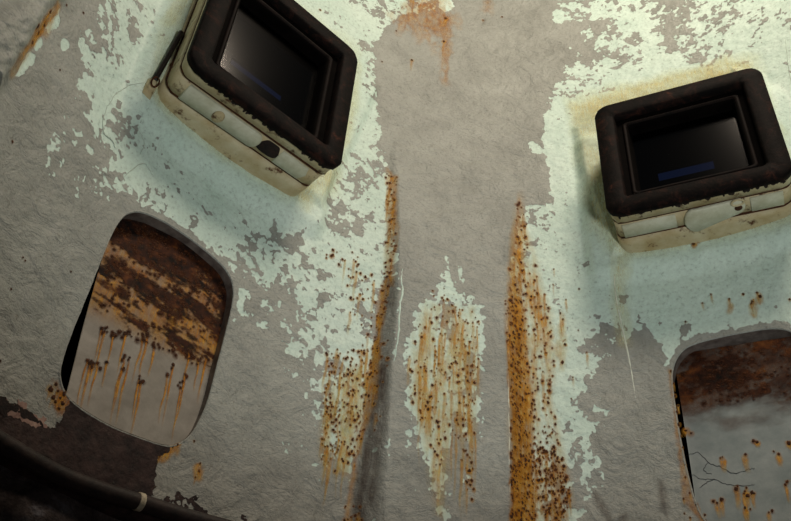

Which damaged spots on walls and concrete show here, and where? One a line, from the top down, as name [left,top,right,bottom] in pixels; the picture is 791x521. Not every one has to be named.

peeling [126,8,145,45]
peeling [600,0,746,71]
peeling [746,6,769,47]
peeling [325,193,380,238]
corrosion [48,219,227,422]
corrosion [321,173,397,521]
peeling [432,294,457,349]
corrosion [409,290,480,501]
corrosion [505,201,571,521]
peeling [517,314,791,521]
corrosion [670,337,791,437]
corrosion [734,485,755,518]